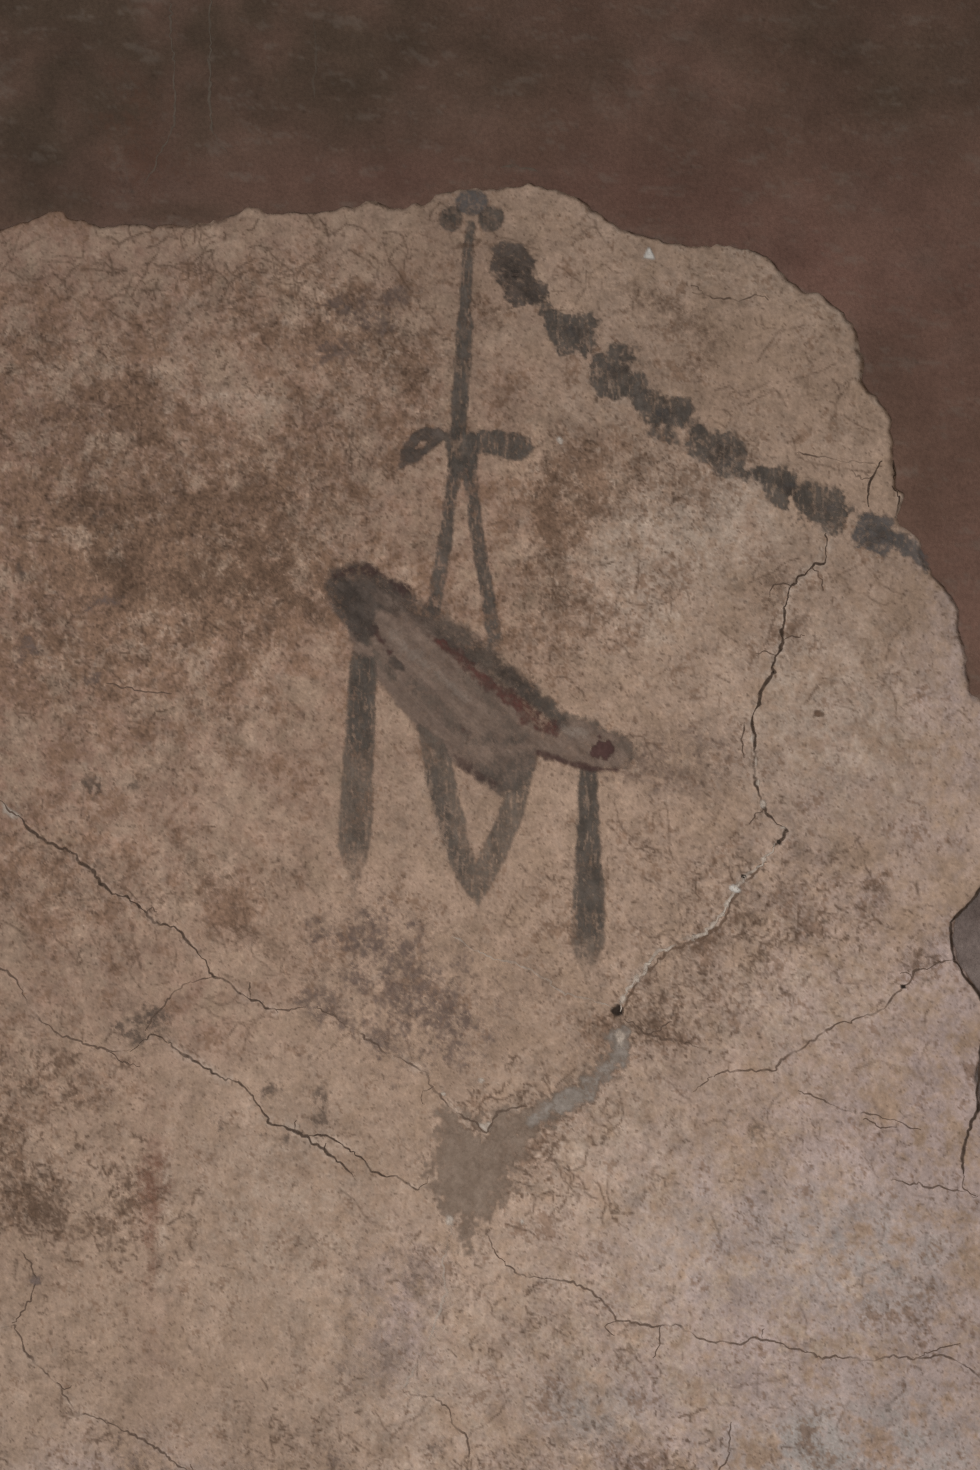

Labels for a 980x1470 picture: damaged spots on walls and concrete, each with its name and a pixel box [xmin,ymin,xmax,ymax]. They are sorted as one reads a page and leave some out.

crack [740,533,827,845]
crack [4,804,215,980]
crack [0,968,424,1190]
crack [363,1034,524,1133]
crack [624,1019,689,1043]
crack [702,888,980,1103]
crack [863,1112,921,1130]
crack [902,1046,980,1196]
crack [12,1255,192,1468]
crack [491,1243,848,1360]
crack [895,1343,974,1372]